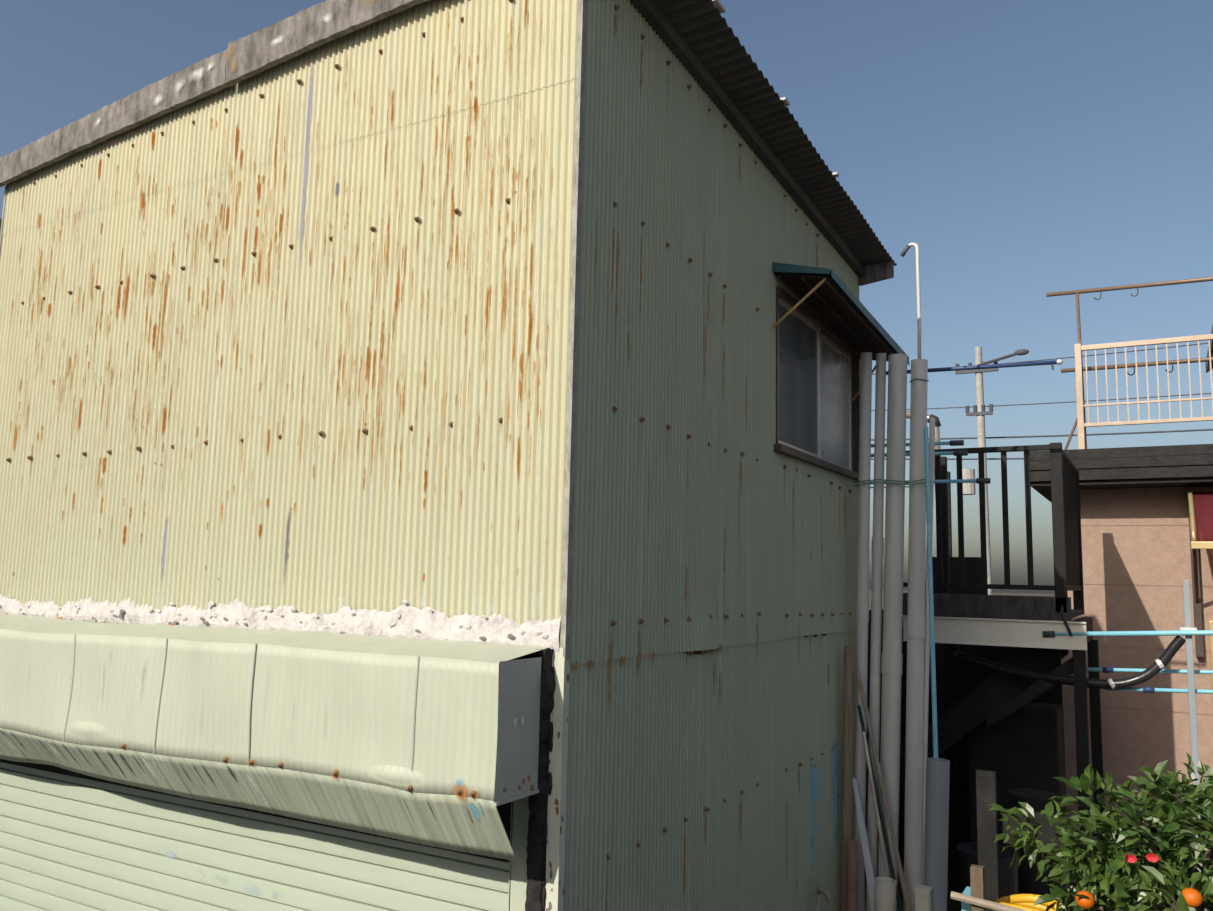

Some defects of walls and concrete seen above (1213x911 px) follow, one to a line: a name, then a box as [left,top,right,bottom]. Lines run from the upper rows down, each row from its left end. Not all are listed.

rust [19,160,119,332]
rust [52,108,292,470]
rust [315,217,429,487]
rust [410,57,548,475]